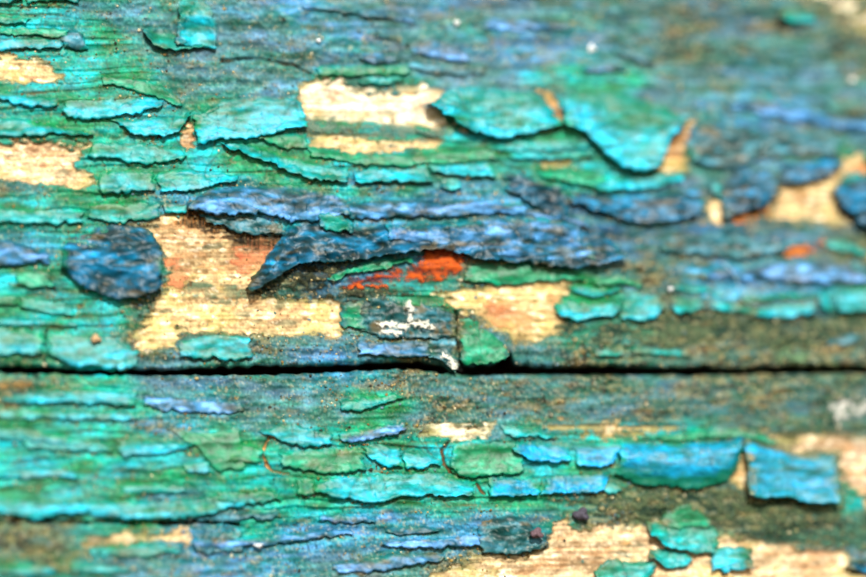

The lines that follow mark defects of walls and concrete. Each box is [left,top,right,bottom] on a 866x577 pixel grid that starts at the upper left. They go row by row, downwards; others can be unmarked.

peeling [142,0,218,51]
peeling [301,2,416,24]
peeling [777,1,816,23]
peeling [835,0,866,33]
peeling [0,15,866,373]
peeling [339,393,404,412]
peeling [0,388,264,474]
peeling [0,467,79,479]
peeling [258,417,866,508]
peeling [0,482,866,577]